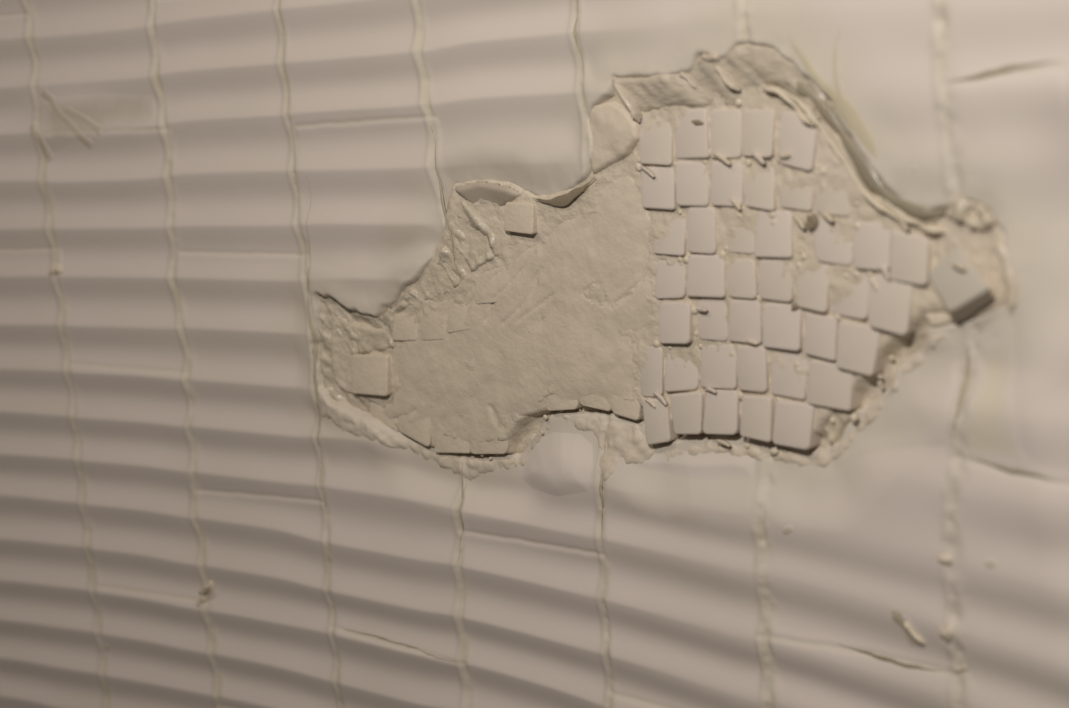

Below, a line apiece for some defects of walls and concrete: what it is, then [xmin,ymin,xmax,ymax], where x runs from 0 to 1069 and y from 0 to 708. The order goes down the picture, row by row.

crack [949,61,1056,82]
spalling [318,44,1018,481]
crack [334,626,456,663]
crack [839,644,949,672]